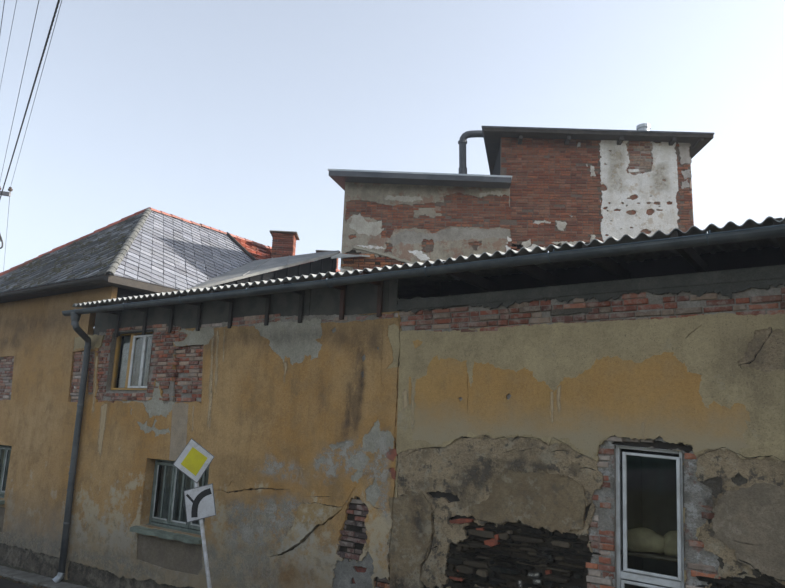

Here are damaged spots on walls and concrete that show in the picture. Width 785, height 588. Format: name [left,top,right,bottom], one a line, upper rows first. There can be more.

flaking render [341,137,694,270]
flaking render [70,284,785,461]
peeling [329,352,785,588]